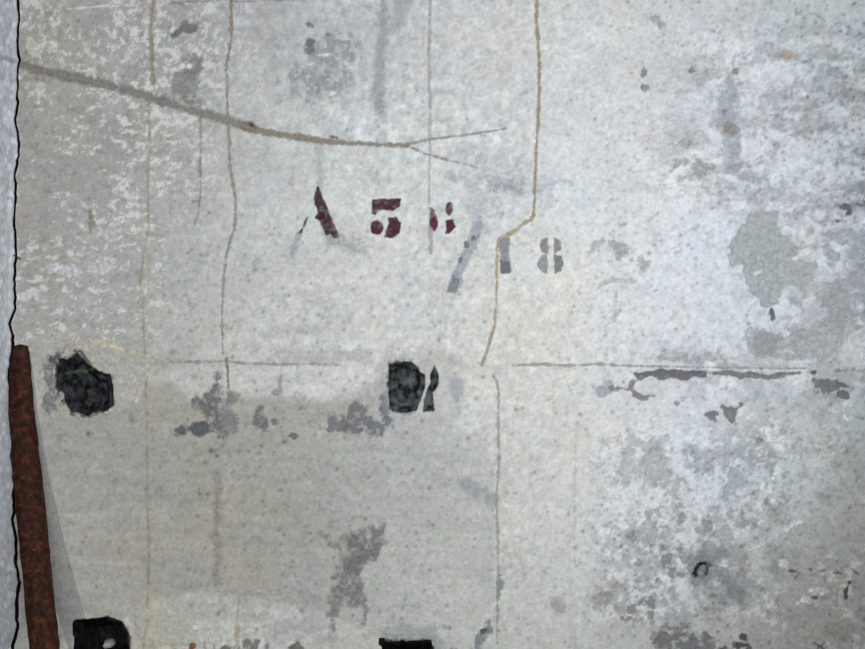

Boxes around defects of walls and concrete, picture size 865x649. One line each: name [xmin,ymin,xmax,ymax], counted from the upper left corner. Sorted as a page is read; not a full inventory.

crack [10,454,21,649]
corrosion [8,344,60,649]
crack [6,0,507,389]
crack [481,0,541,644]